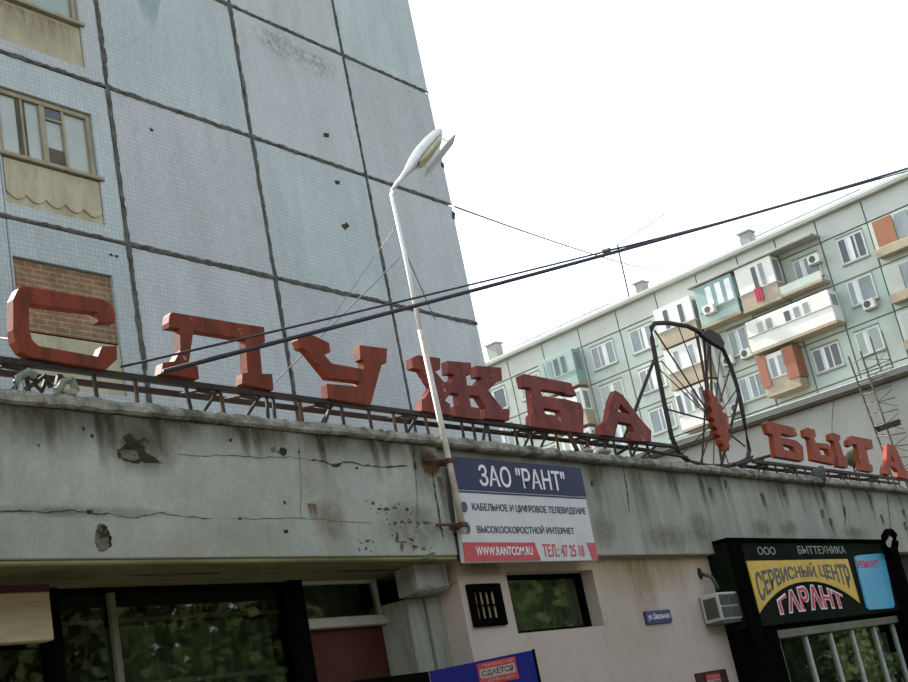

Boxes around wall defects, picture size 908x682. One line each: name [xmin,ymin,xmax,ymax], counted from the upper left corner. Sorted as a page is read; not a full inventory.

spalling [117,430,160,464]
spalling [95,523,112,552]
crack [0,509,213,519]
crack [179,434,463,591]
peeling [366,500,432,552]